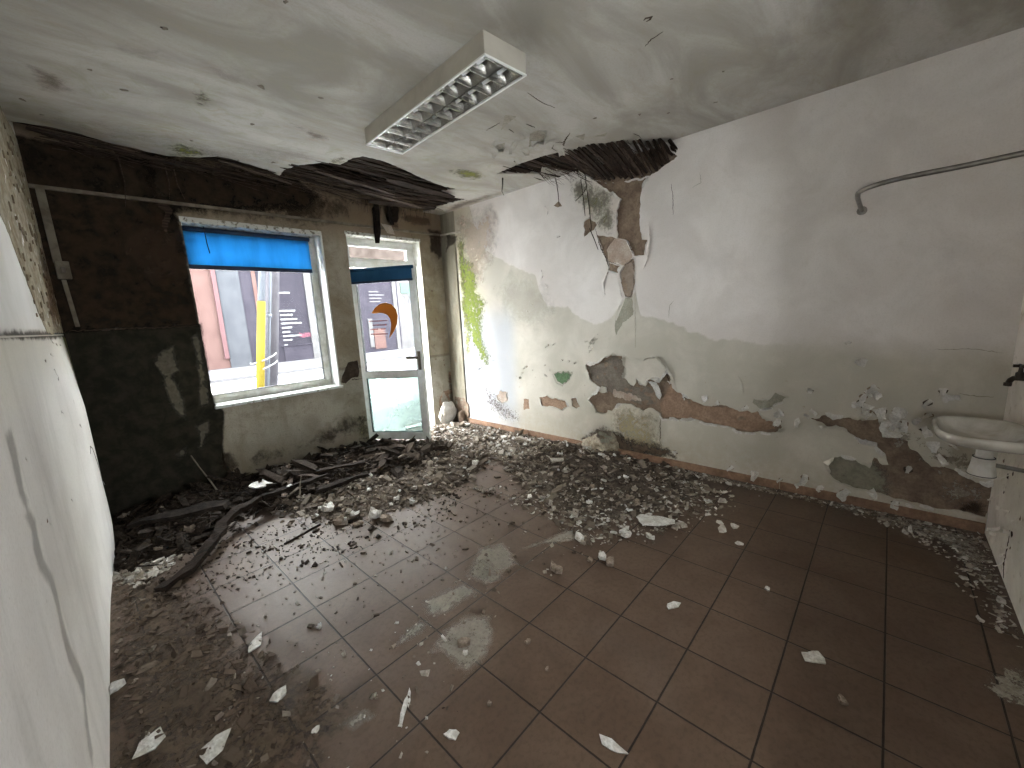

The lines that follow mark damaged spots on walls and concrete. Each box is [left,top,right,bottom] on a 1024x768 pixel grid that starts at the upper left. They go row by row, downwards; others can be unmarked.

peeling [495,143,522,164]
peeling [529,130,565,157]
peeling [582,176,650,274]
damp [15,135,353,517]
damp [319,417,367,440]
peeling [523,333,1014,538]